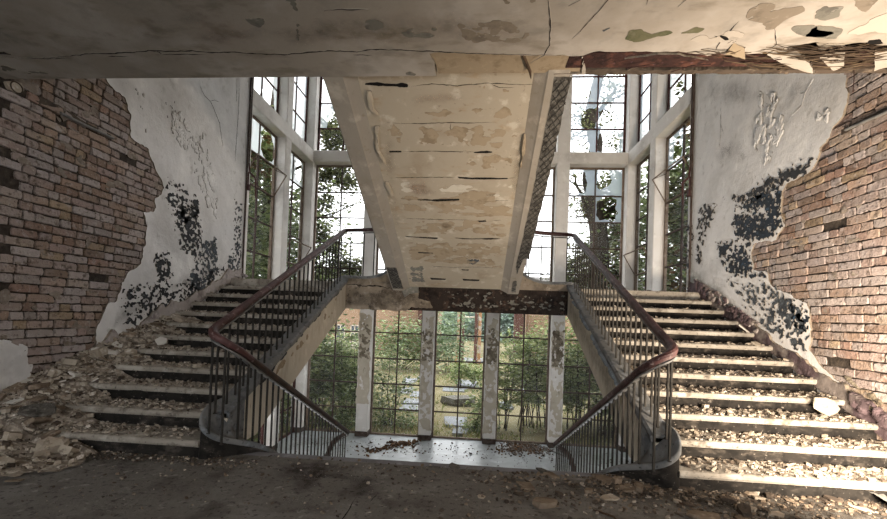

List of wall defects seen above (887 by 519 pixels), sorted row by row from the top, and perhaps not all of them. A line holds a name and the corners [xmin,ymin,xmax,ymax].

crack [0,0,608,63]
peeling [746,0,887,39]
spalling [365,72,416,87]
crack [416,82,532,107]
spalling [0,65,243,376]
peeling [401,107,517,282]
spalling [684,73,887,441]